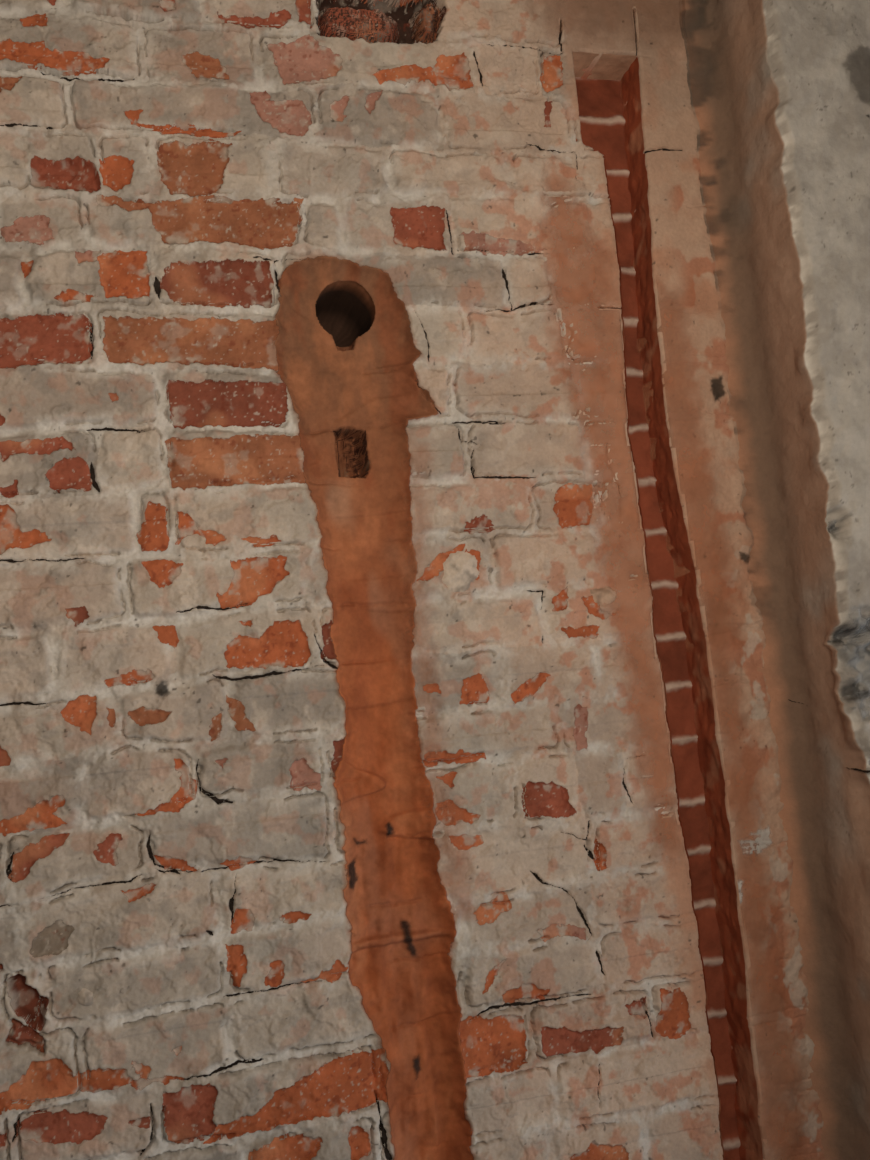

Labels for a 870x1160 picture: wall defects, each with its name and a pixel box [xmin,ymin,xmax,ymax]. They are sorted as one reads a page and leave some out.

spalling [0,38,110,92]
spalling [217,0,446,85]
flaking render [390,205,446,251]
flaking render [0,109,306,493]
spalling [137,501,227,588]
spalling [216,535,337,669]
spalling [60,695,172,735]
spalling [521,781,577,818]
crack [530,871,605,975]
flaking render [0,960,389,1160]
flaking render [458,983,550,1079]
flaking render [541,987,691,1057]